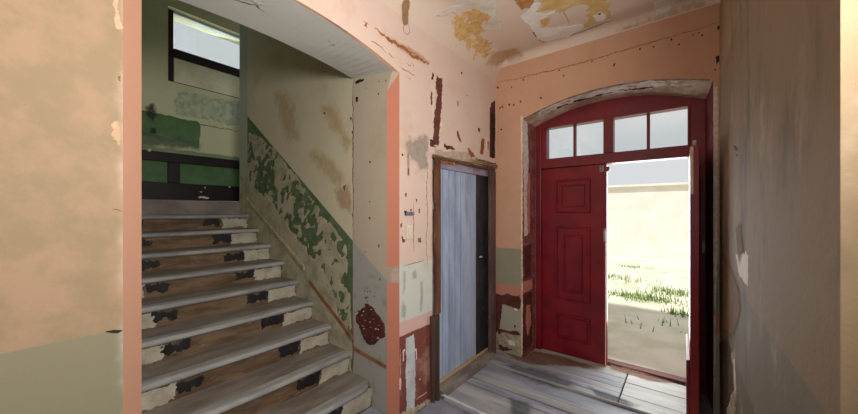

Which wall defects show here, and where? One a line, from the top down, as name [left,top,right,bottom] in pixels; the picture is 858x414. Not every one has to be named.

peeling [434,0,502,30]
peeling [514,0,584,43]
crack [496,23,714,83]
peeling [142,104,201,152]
peeling [430,73,521,165]
peeling [142,259,161,271]
peeling [203,133,386,391]
peeling [736,250,749,287]
peeling [142,282,170,298]
peeling [142,309,179,329]
peeling [142,338,192,365]
peeling [142,375,205,411]